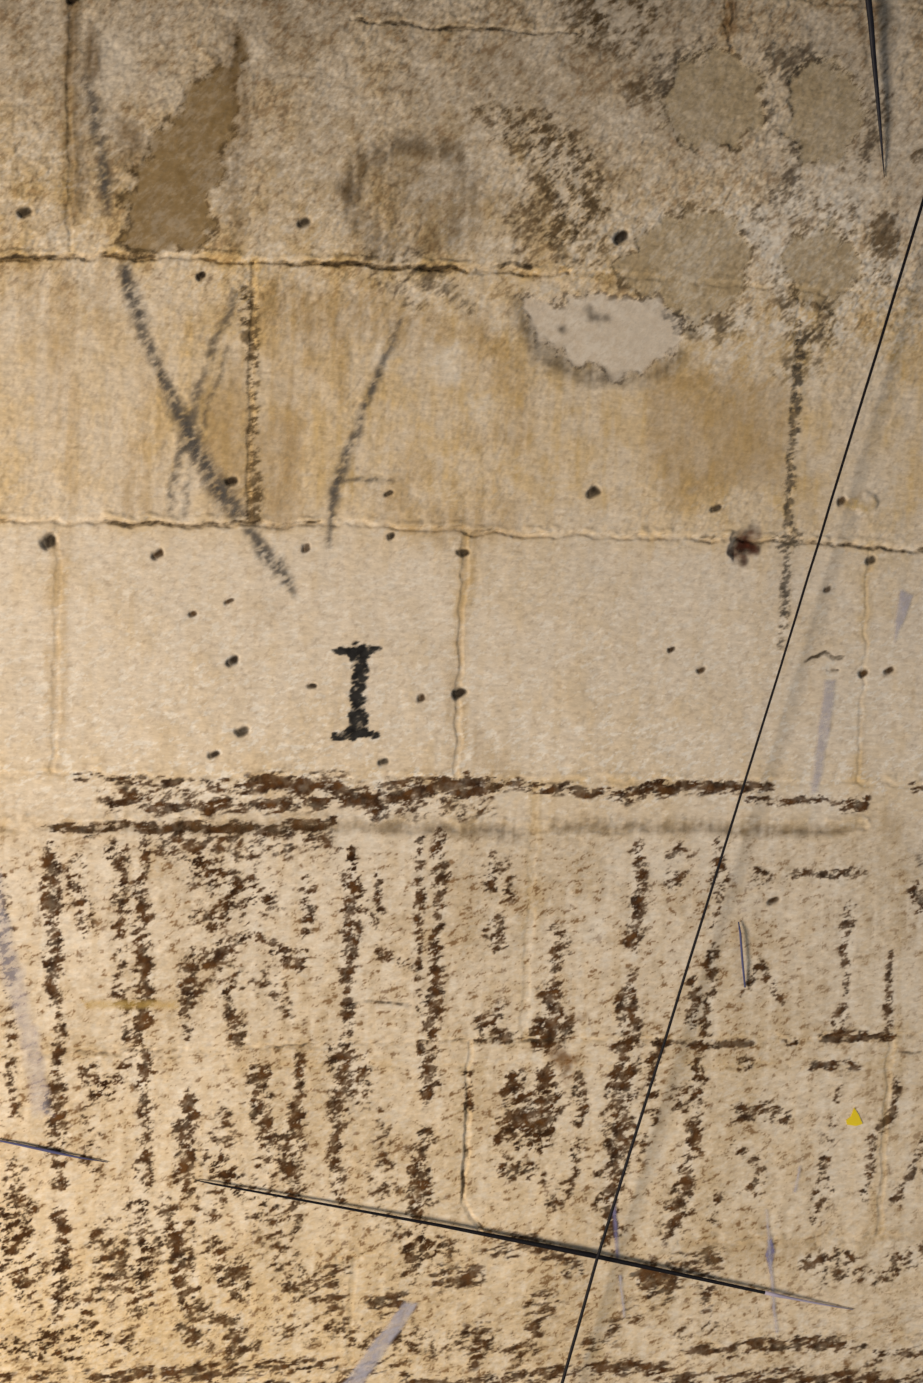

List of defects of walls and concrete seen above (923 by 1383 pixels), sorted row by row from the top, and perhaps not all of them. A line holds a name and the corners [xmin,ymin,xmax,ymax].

peeling [118,38,247,253]
leakage [870,213,896,257]
rust [728,530,759,565]